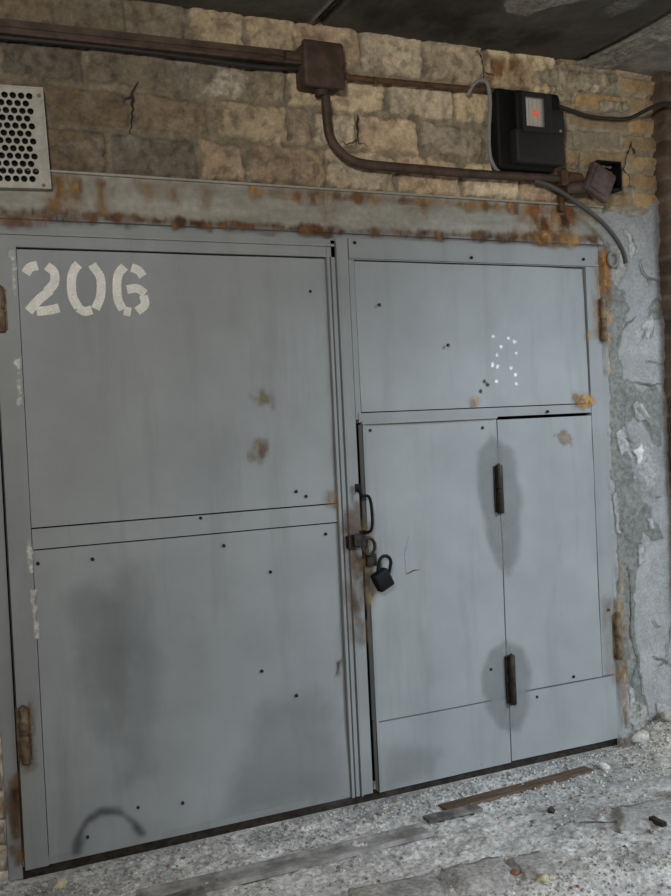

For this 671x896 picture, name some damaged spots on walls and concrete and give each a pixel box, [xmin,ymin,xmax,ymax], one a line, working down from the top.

corrosion [2,176,255,230]
corrosion [266,223,345,237]
corrosion [332,192,381,203]
corrosion [396,201,611,344]
corrosion [574,394,594,408]
peeling [604,229,671,734]